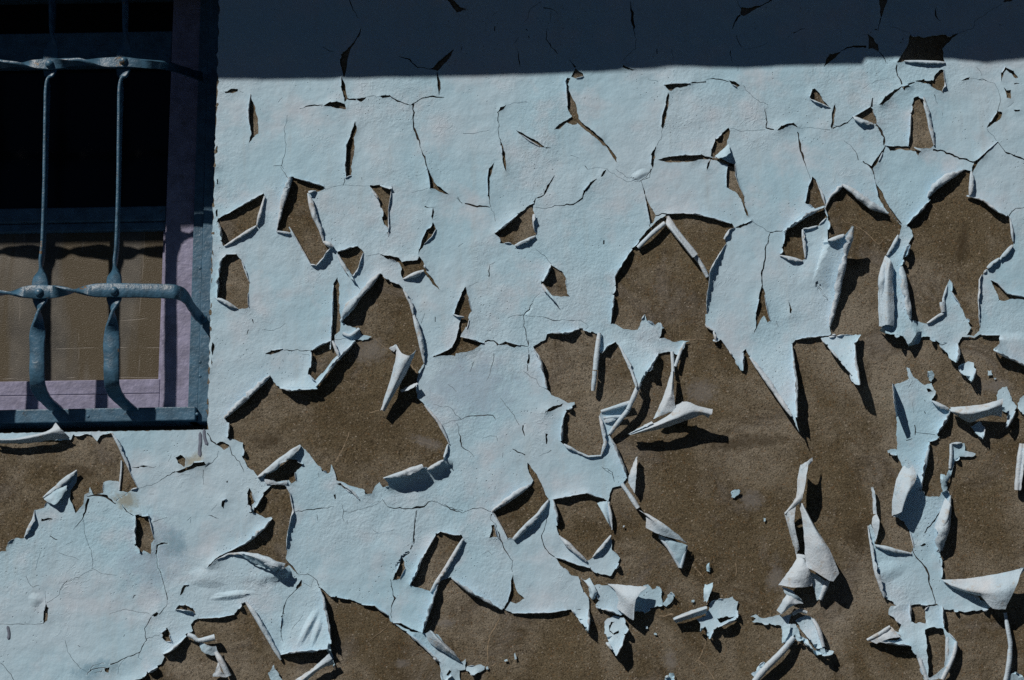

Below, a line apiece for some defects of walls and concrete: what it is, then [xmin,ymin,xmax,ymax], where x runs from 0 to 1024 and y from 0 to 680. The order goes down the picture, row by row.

crack [225,0,1024,244]
peeling [711,128,748,216]
crack [247,277,344,355]
crack [736,220,792,332]
peeling [0,423,139,552]
peeling [138,169,1024,680]
crack [8,433,244,674]
crack [279,561,319,637]